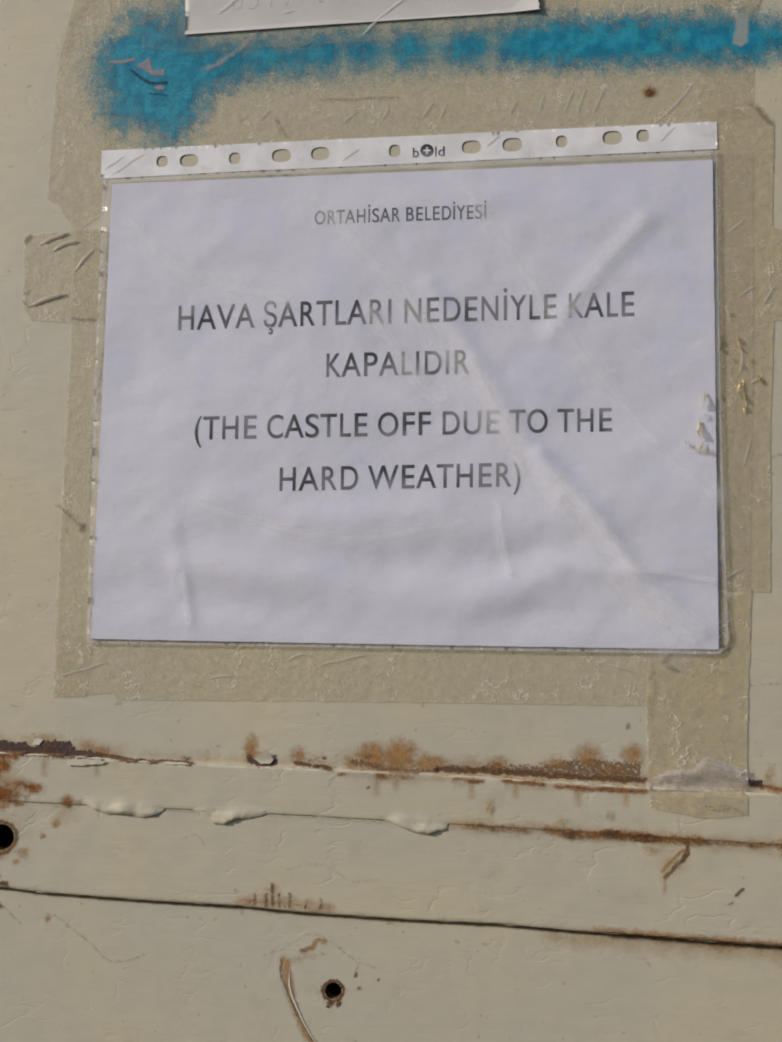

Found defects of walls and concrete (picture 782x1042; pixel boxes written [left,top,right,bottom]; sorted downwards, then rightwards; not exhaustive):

rust [245,740,257,759]
rust [0,753,18,773]
rust [293,743,648,793]
rust [0,783,41,807]
rust [746,779,781,793]
rust [542,813,782,878]
rust [282,958,312,1042]